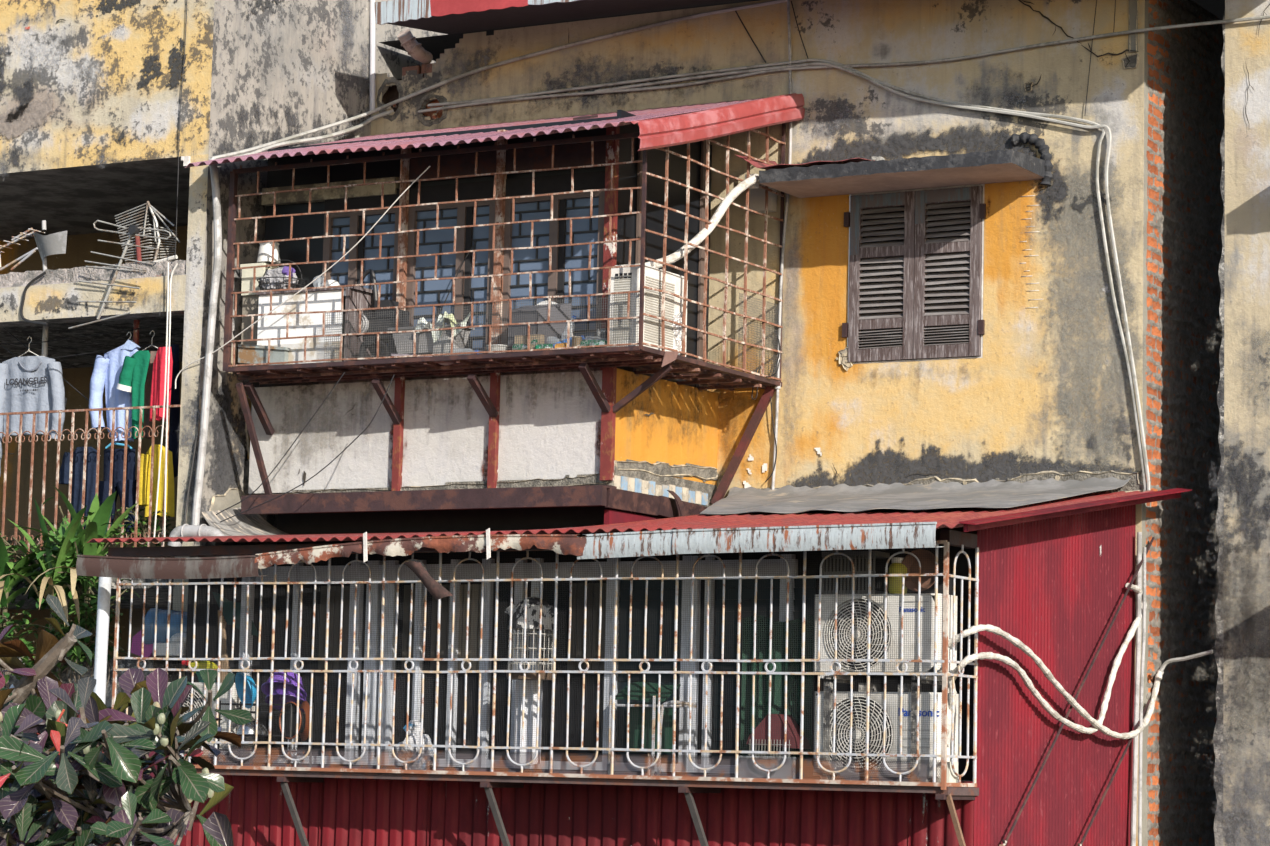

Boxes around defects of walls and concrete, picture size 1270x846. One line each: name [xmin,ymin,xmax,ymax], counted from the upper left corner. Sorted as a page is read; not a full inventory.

damp [0,29,104,123]
damp [96,0,178,36]
damp [134,37,187,91]
damp [213,0,370,157]
crack [1018,0,1139,66]
damp [791,100,1144,489]
damp [1209,440,1270,733]